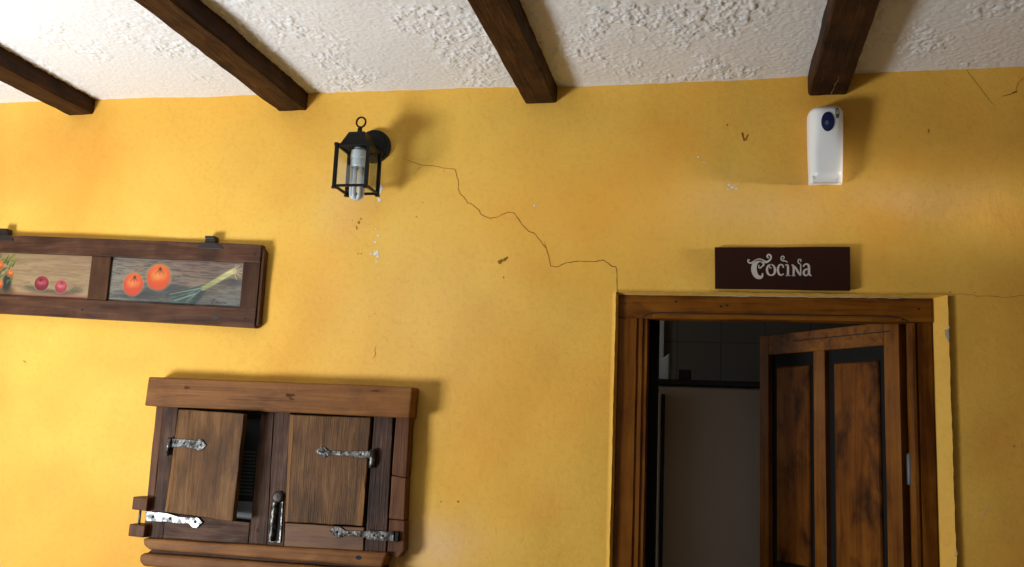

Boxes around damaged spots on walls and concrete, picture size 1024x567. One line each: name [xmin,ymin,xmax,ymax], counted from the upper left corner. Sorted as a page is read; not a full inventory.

crack [408,160,618,291]